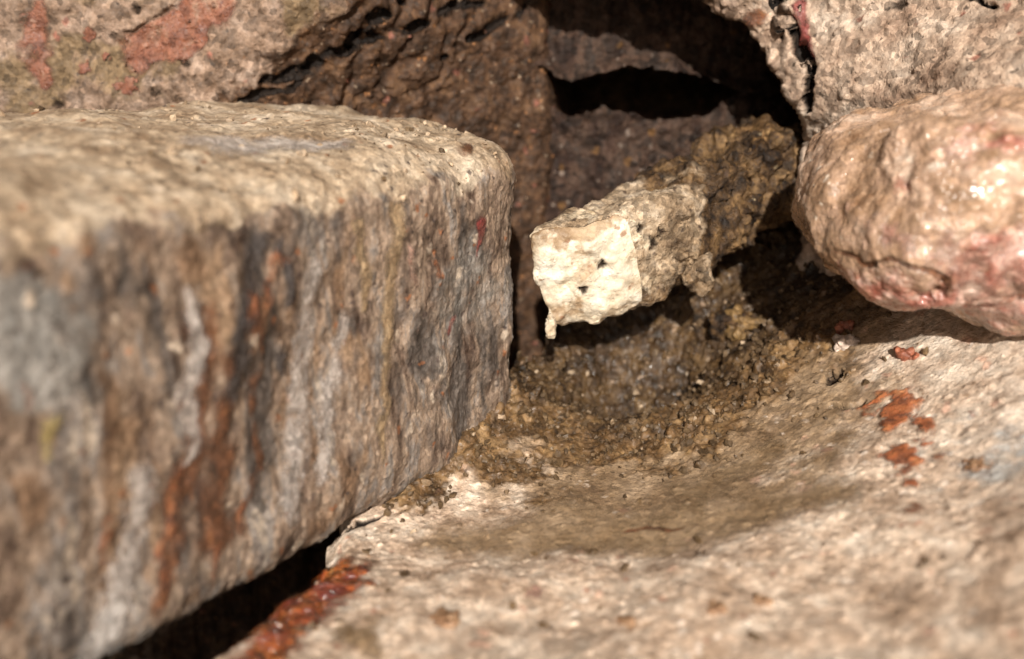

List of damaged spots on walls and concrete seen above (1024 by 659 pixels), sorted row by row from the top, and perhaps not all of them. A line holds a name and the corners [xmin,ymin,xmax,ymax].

crack [769,0,817,110]
corrosion [862,387,943,486]
corrosion [233,556,375,659]